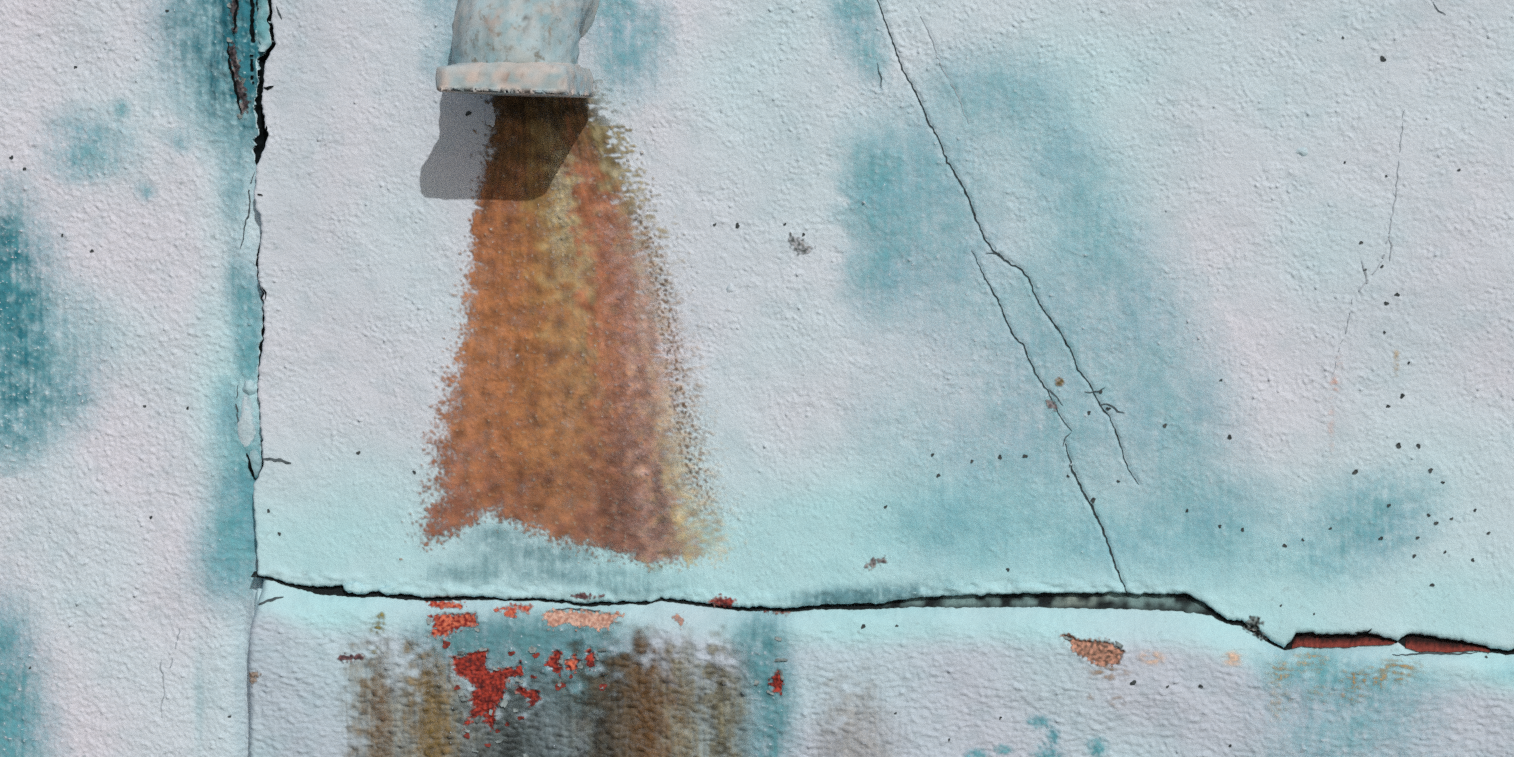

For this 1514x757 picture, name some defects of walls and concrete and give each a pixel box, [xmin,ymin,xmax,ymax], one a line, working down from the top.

crack [227,0,291,480]
corrosion [420,95,721,567]
crack [251,0,1514,656]
corrosion [352,646,466,757]
peeling [426,592,625,753]
corrosion [582,631,746,757]
spalling [1060,633,1125,667]
spalling [1292,634,1490,658]